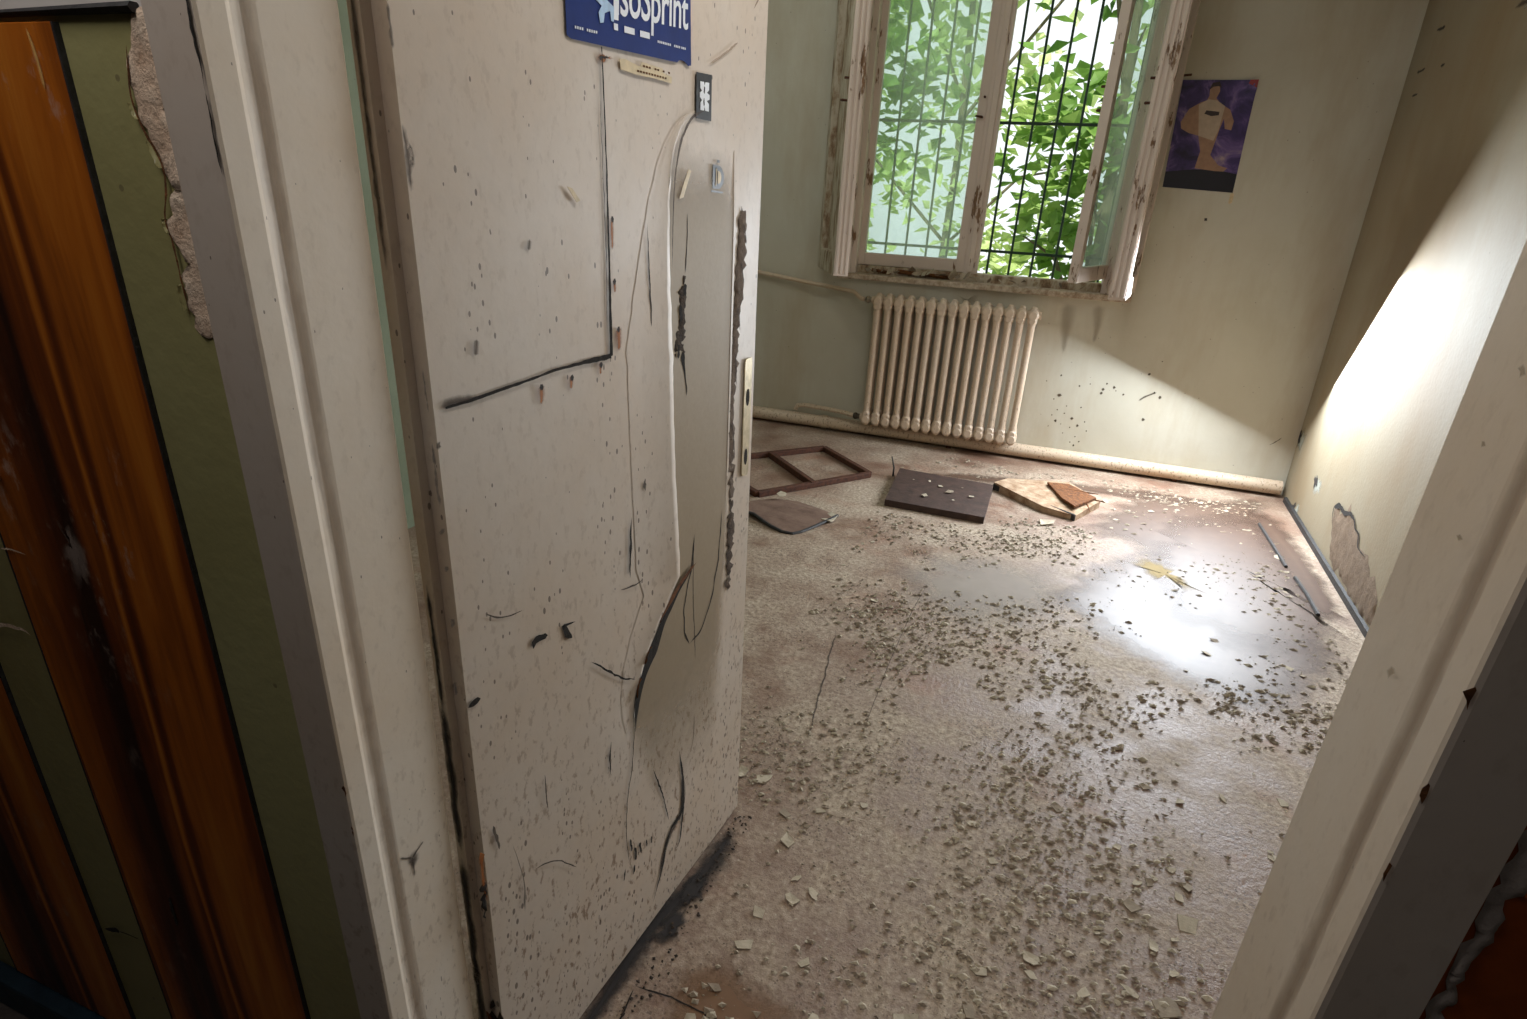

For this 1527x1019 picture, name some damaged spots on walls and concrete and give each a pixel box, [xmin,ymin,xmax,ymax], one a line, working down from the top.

flaking render [126,6,213,339]
damp [936,474,1007,483]
damp [1062,484,1336,703]
flaking render [1329,503,1377,625]
spalling [1463,687,1477,710]
spalling [1420,784,1430,804]
spalling [1425,830,1527,1019]